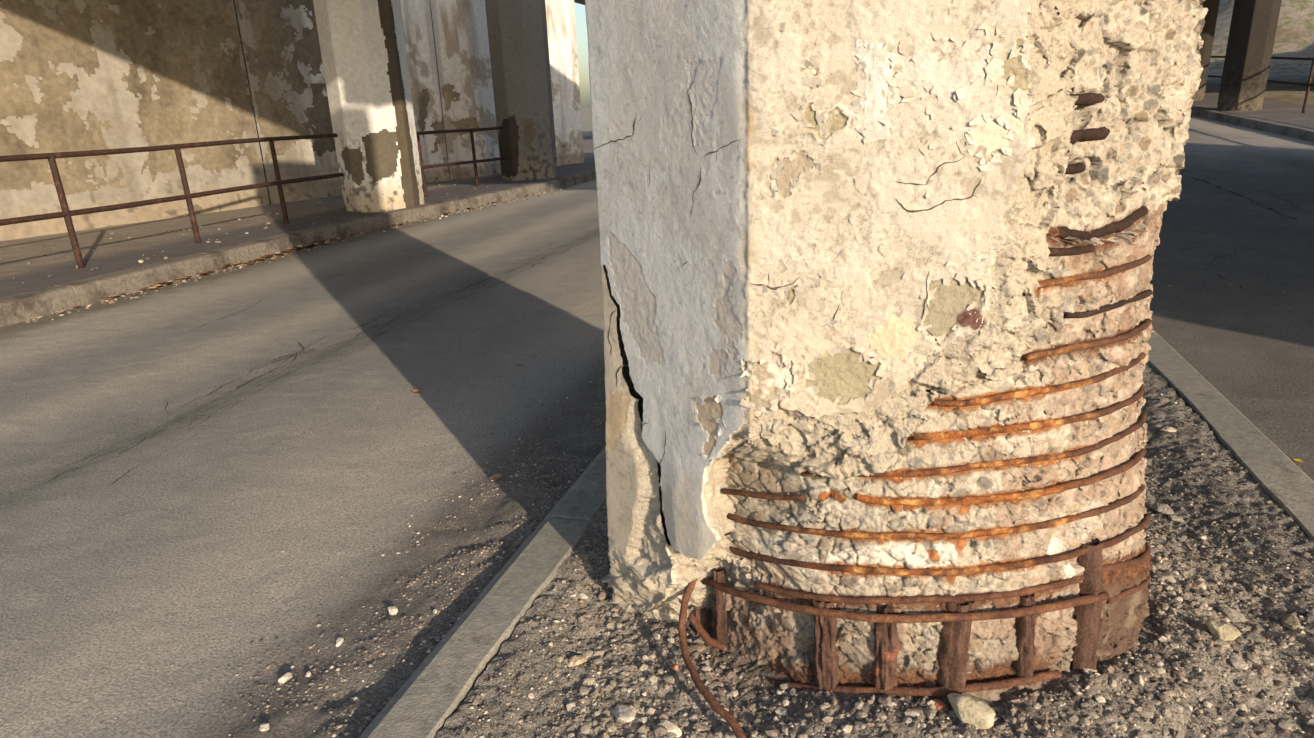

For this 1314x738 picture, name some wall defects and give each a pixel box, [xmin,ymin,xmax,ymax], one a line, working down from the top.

peeling [0,0,479,208]
crack [593,113,642,150]
crack [687,62,740,217]
crack [896,140,982,213]
crack [608,308,629,387]
spalling [606,0,1208,701]
rust [957,309,984,330]
rust [1023,321,1141,367]
rust [908,417,1063,448]
rust [818,445,1090,515]
rust [766,523,1083,613]
rust [966,662,1017,684]